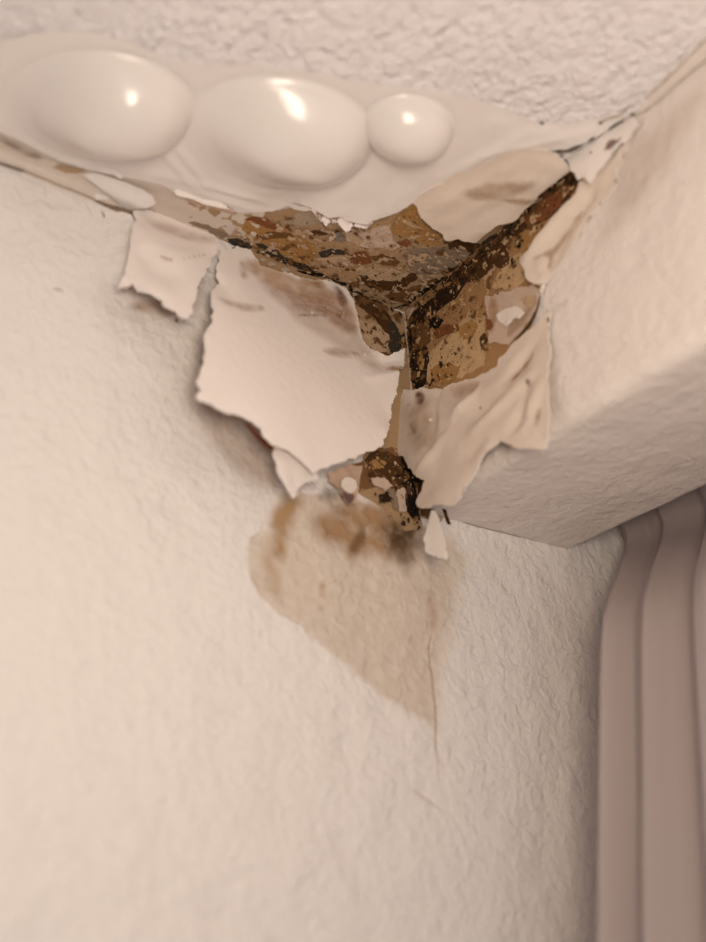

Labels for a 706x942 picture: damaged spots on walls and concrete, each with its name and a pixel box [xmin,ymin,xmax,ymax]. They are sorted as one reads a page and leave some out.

peeling [0,29,639,559]
water stain [189,173,579,389]
water stain [321,450,424,555]